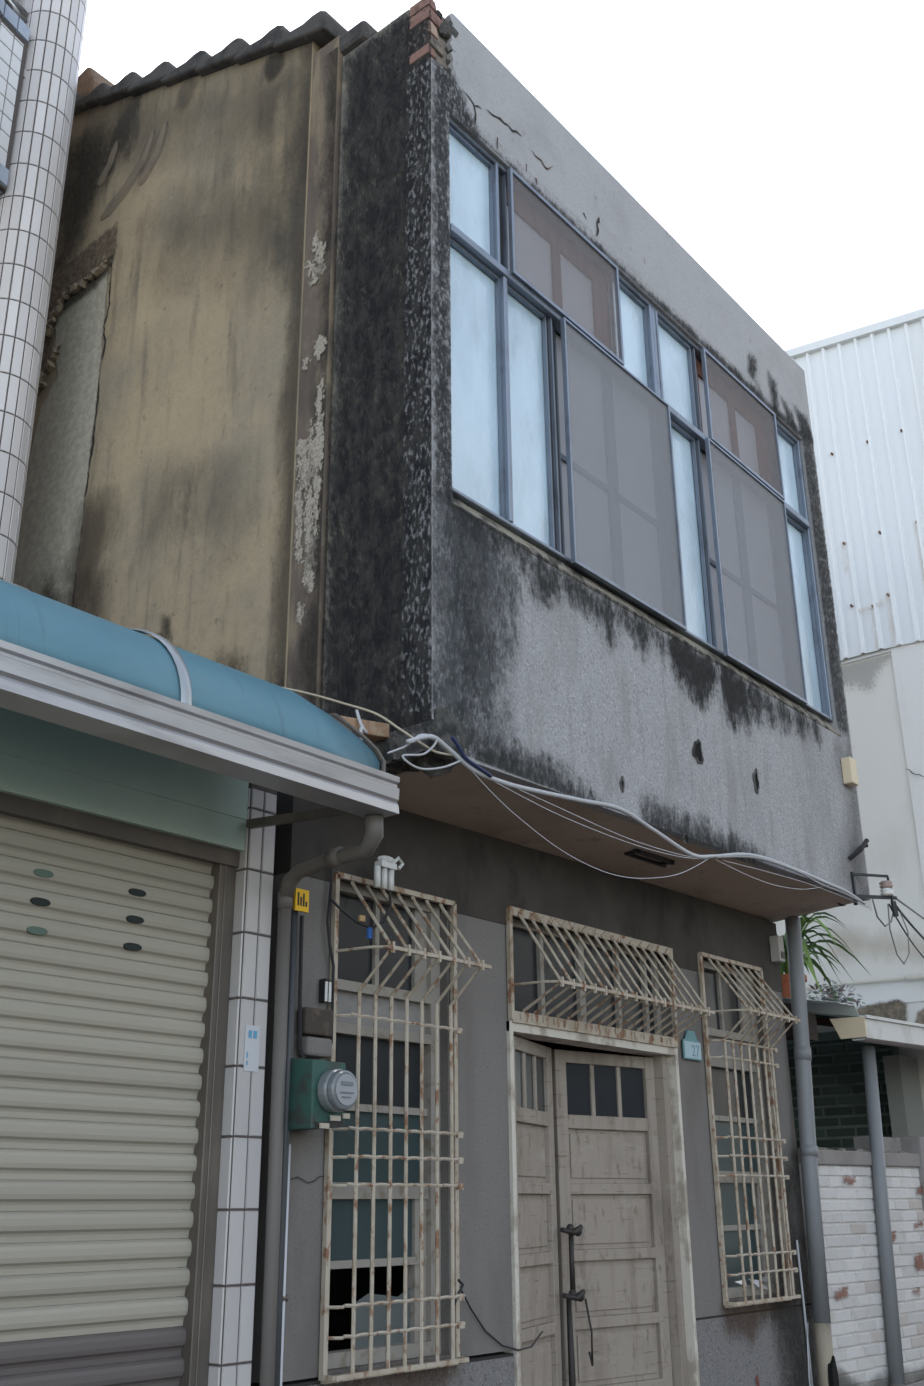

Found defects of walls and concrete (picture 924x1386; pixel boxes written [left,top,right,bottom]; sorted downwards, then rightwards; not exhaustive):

damp [264,50,283,79]
crack [467,95,553,183]
damp [54,95,141,270]
peeling [304,230,327,287]
damp [276,1,848,801]
peeling [293,334,327,625]
damp [642,796,758,864]
peeling [835,1286,849,1301]
peeling [913,1254,924,1294]